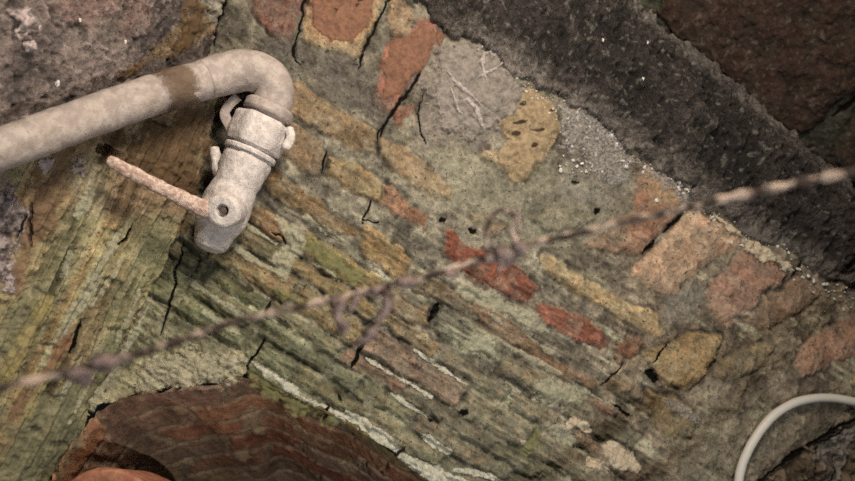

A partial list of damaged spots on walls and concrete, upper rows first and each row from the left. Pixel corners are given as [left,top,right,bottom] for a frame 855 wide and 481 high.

crack [292,0,307,66]
crack [357,0,390,71]
crack [377,71,426,143]
crack [160,240,184,336]
crack [245,338,265,378]
efflorescence [413,349,466,384]
efflorescence [252,357,502,481]
crack [758,418,855,481]